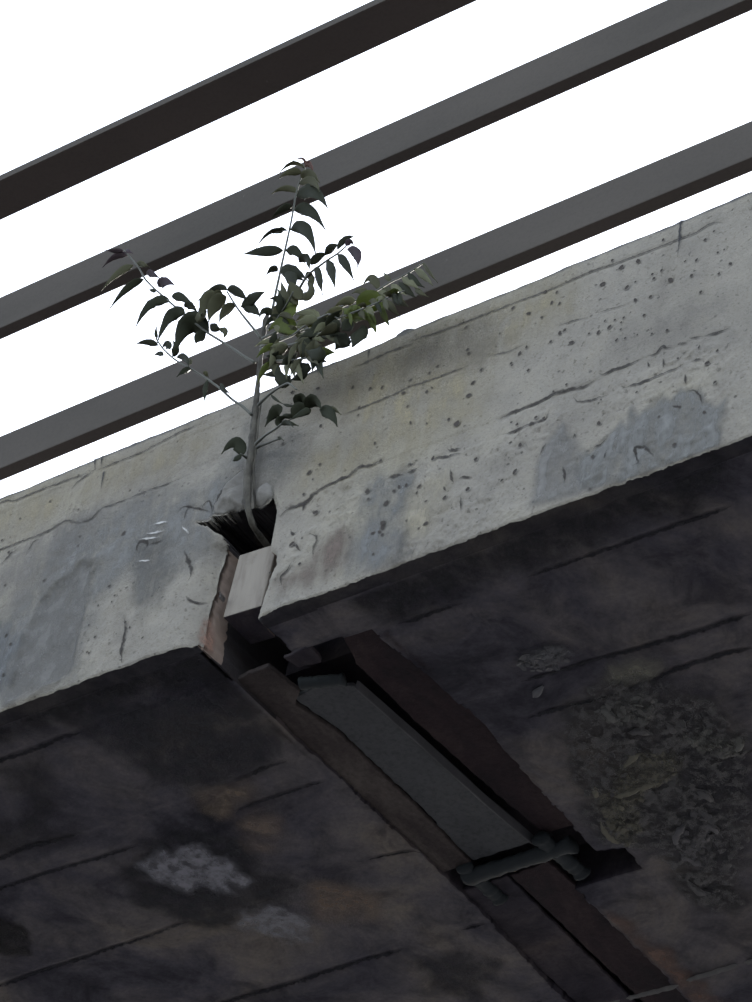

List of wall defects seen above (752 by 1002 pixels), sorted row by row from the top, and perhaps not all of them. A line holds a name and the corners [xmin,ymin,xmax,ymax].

crack [505,330,724,434]
crack [633,445,652,462]
water stain [127,831,309,940]